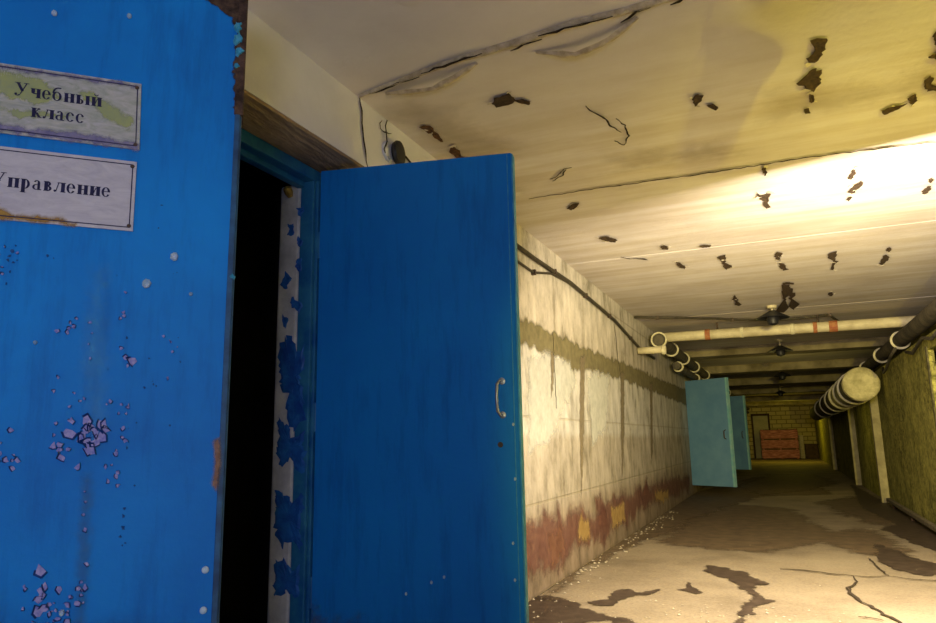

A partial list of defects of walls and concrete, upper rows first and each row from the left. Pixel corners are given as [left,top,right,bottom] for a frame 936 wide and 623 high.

rust [208,0,248,125]
spalling [488,91,531,108]
spalling [796,38,828,114]
spalling [881,94,918,115]
spalling [924,76,936,93]
spalling [756,191,775,209]
spalling [846,167,863,201]
spalling [776,282,799,313]
peeling [276,258,307,474]
rust [212,438,221,489]
damp [528,474,936,623]
crack [791,557,936,623]